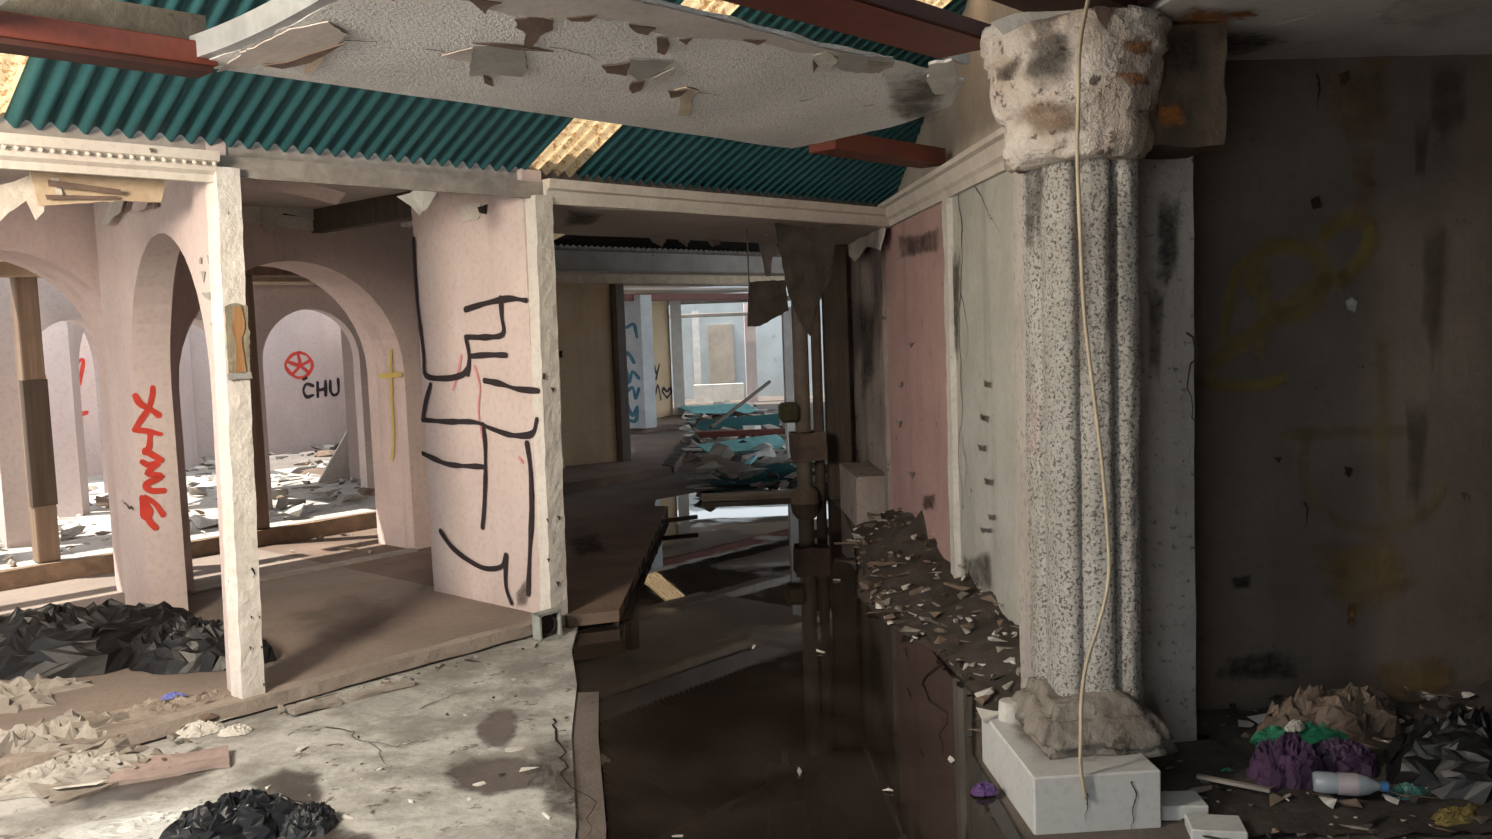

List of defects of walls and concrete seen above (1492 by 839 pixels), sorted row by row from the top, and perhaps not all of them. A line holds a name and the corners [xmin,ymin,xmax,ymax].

peeling [991,11,1071,35]
peeling [442,0,894,116]
peeling [927,58,958,94]
leakage [997,34,1064,80]
leakage [1022,106,1073,130]
peeling [0,175,63,221]
leakage [1159,207,1178,281]
leakage [445,711,577,816]
crack [1129,781,1137,829]